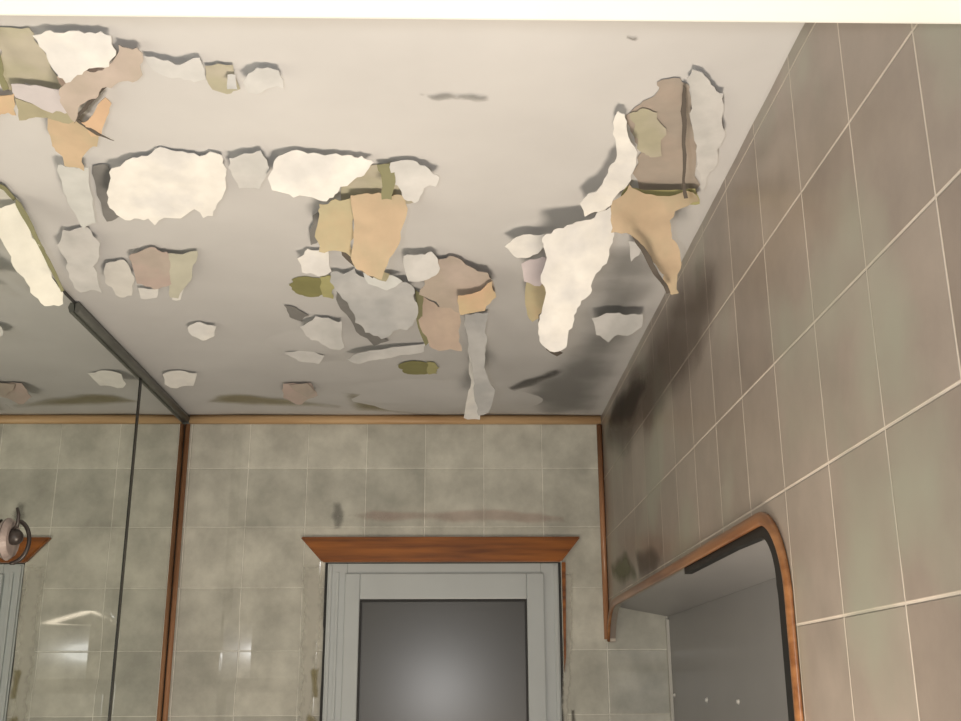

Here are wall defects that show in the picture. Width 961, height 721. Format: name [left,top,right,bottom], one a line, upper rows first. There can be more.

peeling [0,27,496,420]
peeling [505,69,725,356]
leakage [612,387,641,421]